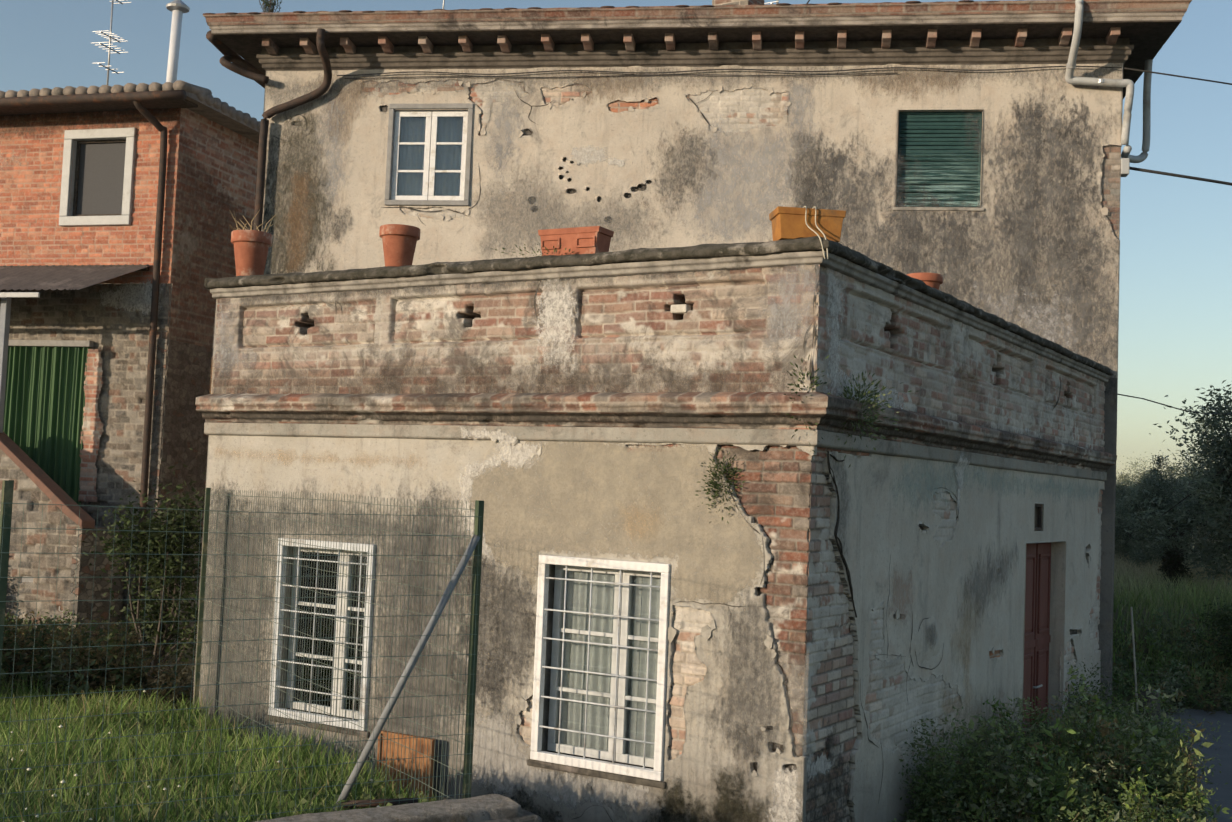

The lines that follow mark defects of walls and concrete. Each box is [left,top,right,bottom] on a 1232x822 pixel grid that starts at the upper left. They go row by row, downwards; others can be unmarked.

damp [265,75,538,274]
spalling [559,158,601,202]
flaking render [608,98,659,113]
spalling [624,181,652,198]
damp [553,64,1120,409]
spalling [1101,145,1121,239]
damp [161,157,797,819]
peeling [460,427,542,468]
crack [827,451,857,617]
flaking render [667,605,716,760]
flaking render [716,445,963,822]